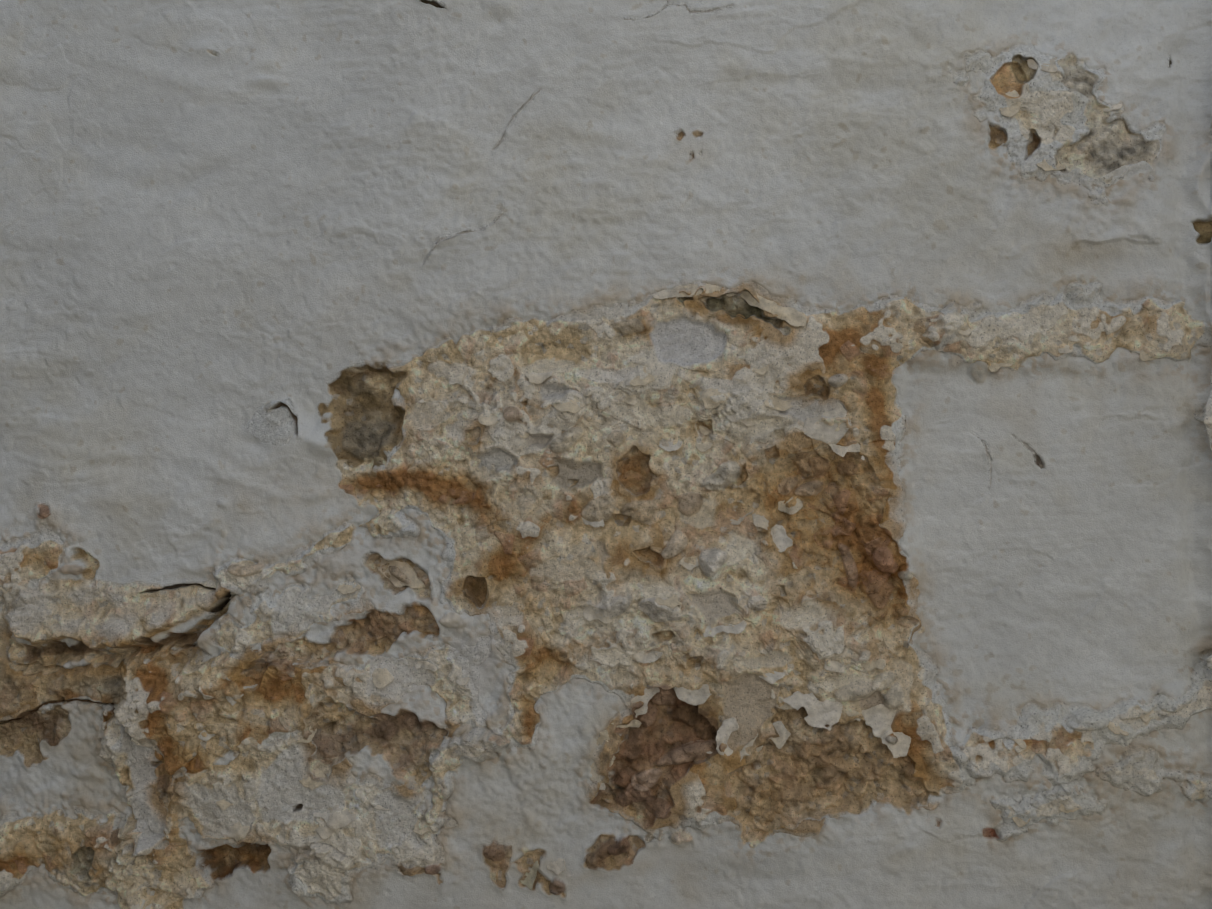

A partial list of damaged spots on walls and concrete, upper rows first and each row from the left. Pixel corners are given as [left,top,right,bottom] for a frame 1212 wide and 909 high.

flaking render [947,44,1166,207]
peeling [1191,216,1212,245]
flaking render [1193,368,1212,452]
peeling [1034,454,1046,470]
flaking render [0,281,976,906]
crack [0,698,115,723]
peeling [982,828,1001,840]